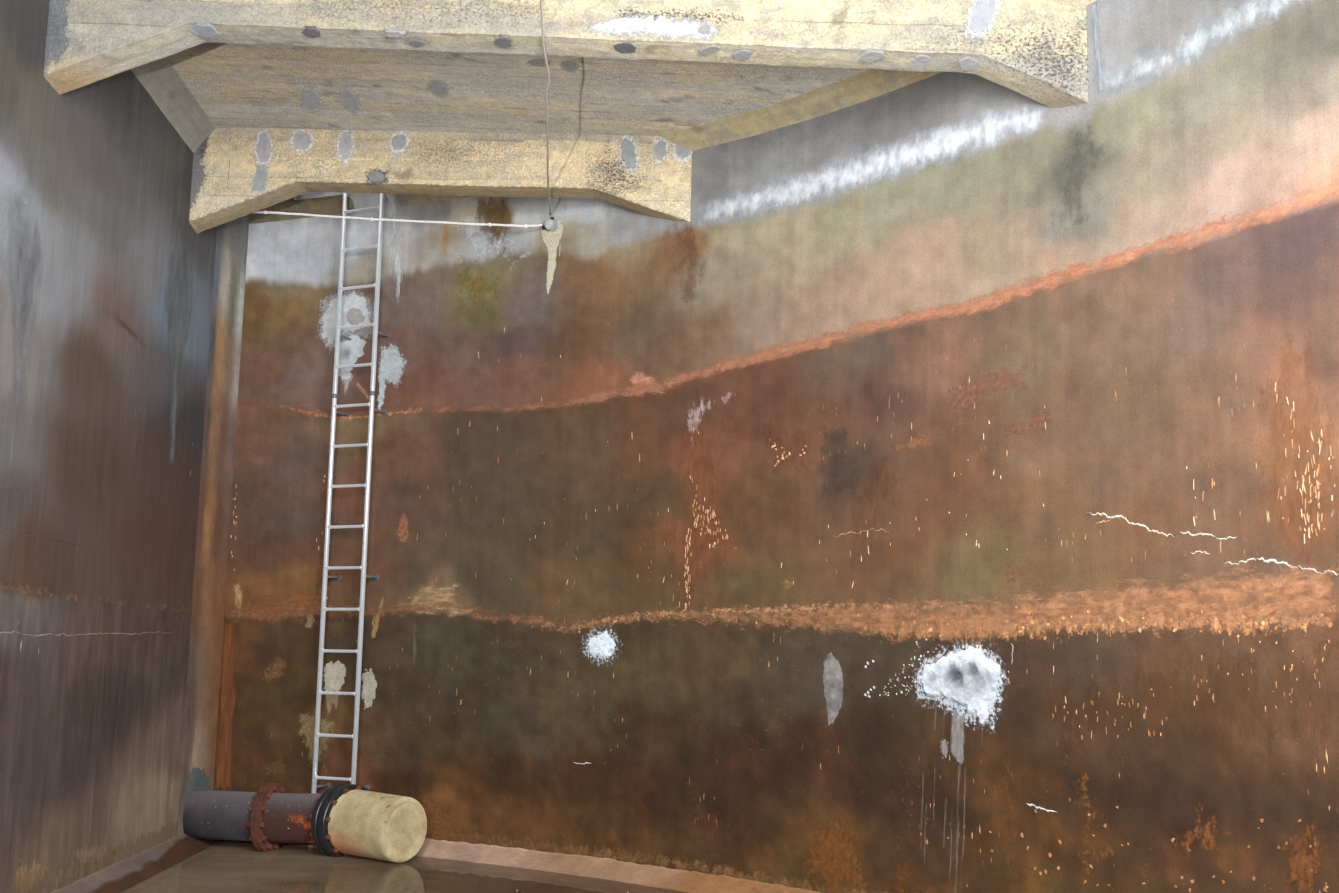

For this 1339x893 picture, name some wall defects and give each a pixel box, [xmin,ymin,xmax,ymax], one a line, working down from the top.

damp [619,5,744,24]
damp [703,0,1289,221]
damp [459,220,530,262]
damp [541,219,564,294]
corrosion [471,184,1339,411]
corrosion [254,403,454,420]
crack [1090,512,1338,576]
crack [0,629,172,637]
corrosion [216,566,1337,789]